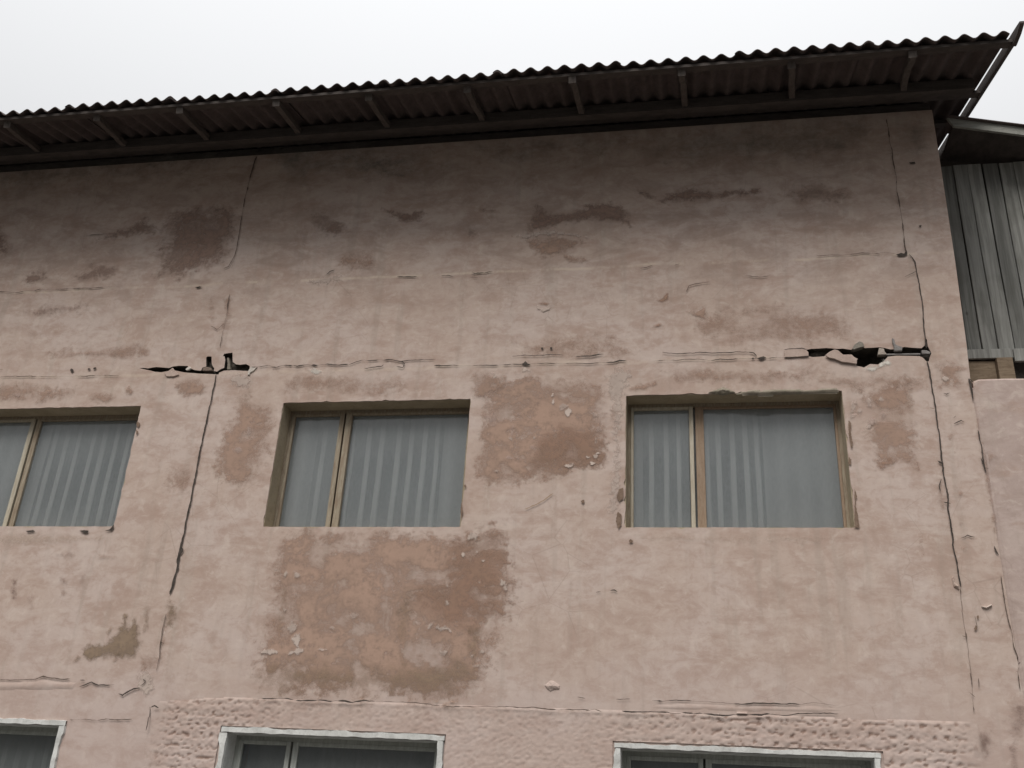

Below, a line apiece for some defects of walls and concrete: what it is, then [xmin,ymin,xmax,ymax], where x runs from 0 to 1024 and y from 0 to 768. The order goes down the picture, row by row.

spalling [141,353,257,394]
crack [260,354,625,369]
crack [658,348,809,361]
spalling [774,316,931,367]
peeling [213,404,270,483]
peeling [476,361,605,486]
peeling [848,380,916,467]
crack [819,119,1020,710]
peeling [261,523,513,706]
crack [259,697,834,716]